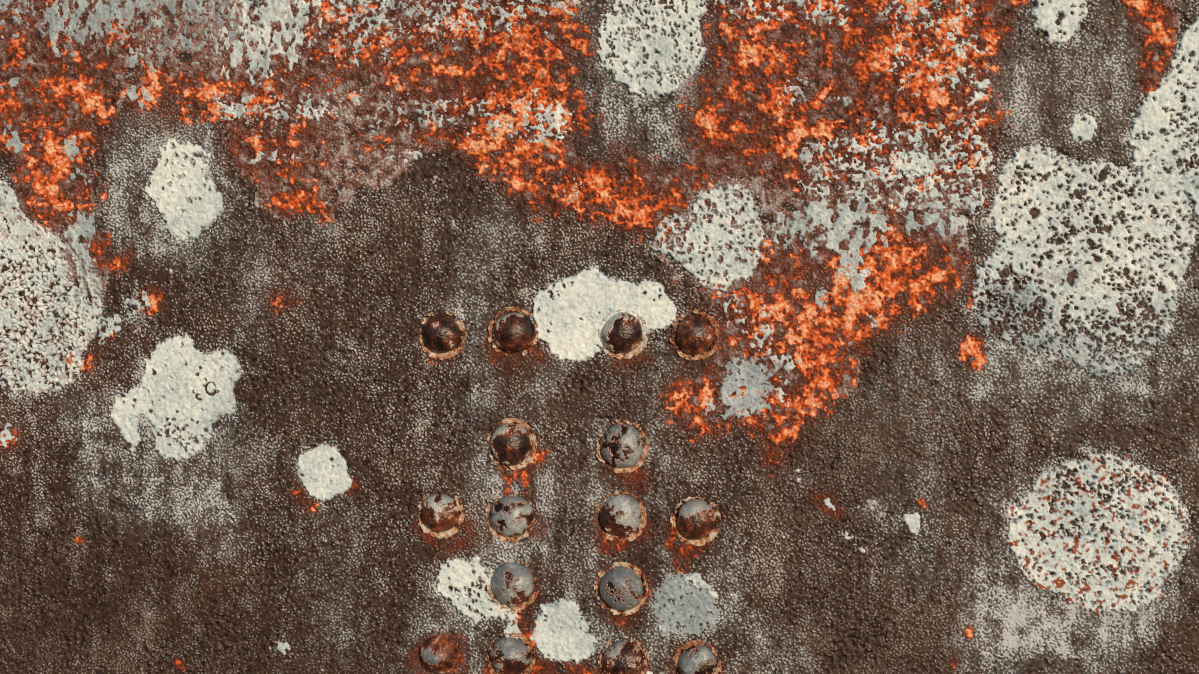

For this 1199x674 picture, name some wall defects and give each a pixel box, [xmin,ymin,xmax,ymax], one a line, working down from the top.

rust [1121,0,1177,94]
rust [0,0,1029,477]
rust [497,442,550,498]
rust [414,519,474,552]
rust [593,515,712,574]
rust [514,587,602,674]